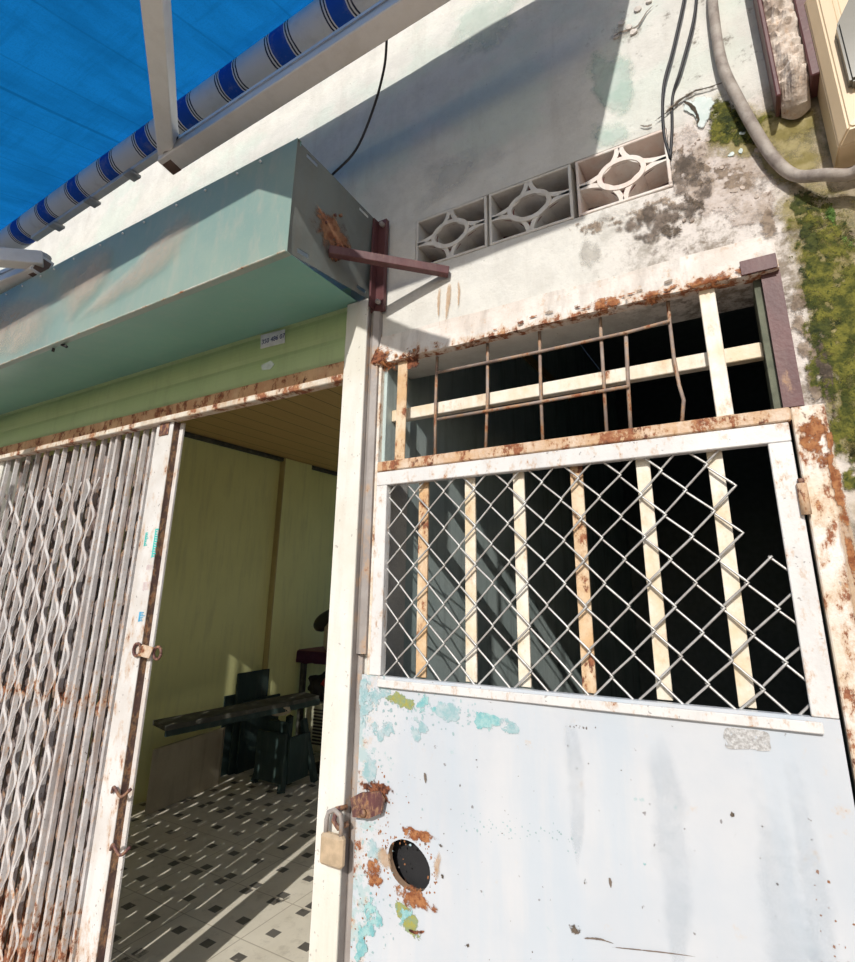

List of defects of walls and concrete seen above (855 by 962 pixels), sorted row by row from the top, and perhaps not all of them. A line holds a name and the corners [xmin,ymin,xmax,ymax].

leakage [593,58,632,110]
flaking render [671,96,779,226]
leakage [575,146,752,262]
corrosion [587,296,620,316]
corrosion [687,269,749,294]
corrosion [371,345,419,372]
leakage [791,289,836,419]
corrosion [797,414,855,610]
peeling [359,679,461,742]
peeling [474,712,519,734]
peeling [354,892,383,962]
peeling [394,901,421,941]